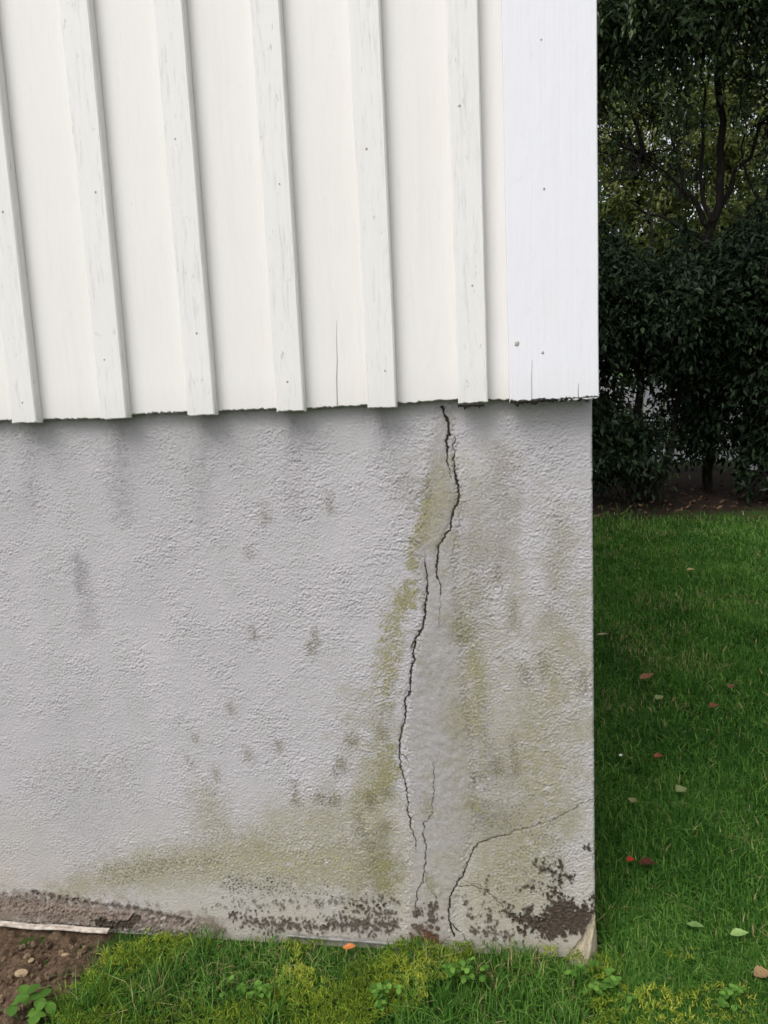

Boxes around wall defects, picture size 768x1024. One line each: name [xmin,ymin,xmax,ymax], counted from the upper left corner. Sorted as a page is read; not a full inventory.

crack [399,406,460,916]
crack [447,799,592,943]